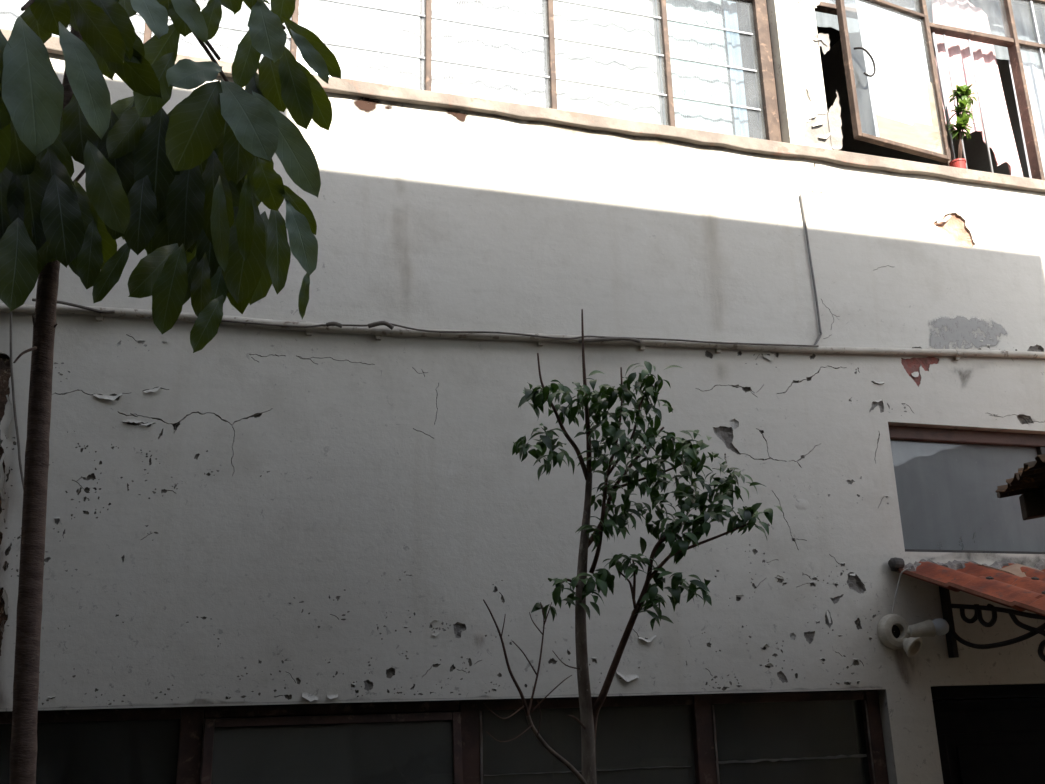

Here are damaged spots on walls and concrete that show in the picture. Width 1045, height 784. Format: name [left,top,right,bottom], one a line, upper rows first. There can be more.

peeling [804,89,843,150]
spalling [932,213,975,248]
crack [695,366,884,397]
peeling [901,316,1044,387]
peeling [0,352,22,577]
crack [52,386,271,476]
crack [739,428,820,468]
crack [990,414,1045,424]
peeling [0,587,9,656]
spalling [728,544,880,685]
peeling [259,659,338,702]
peeling [386,656,482,695]